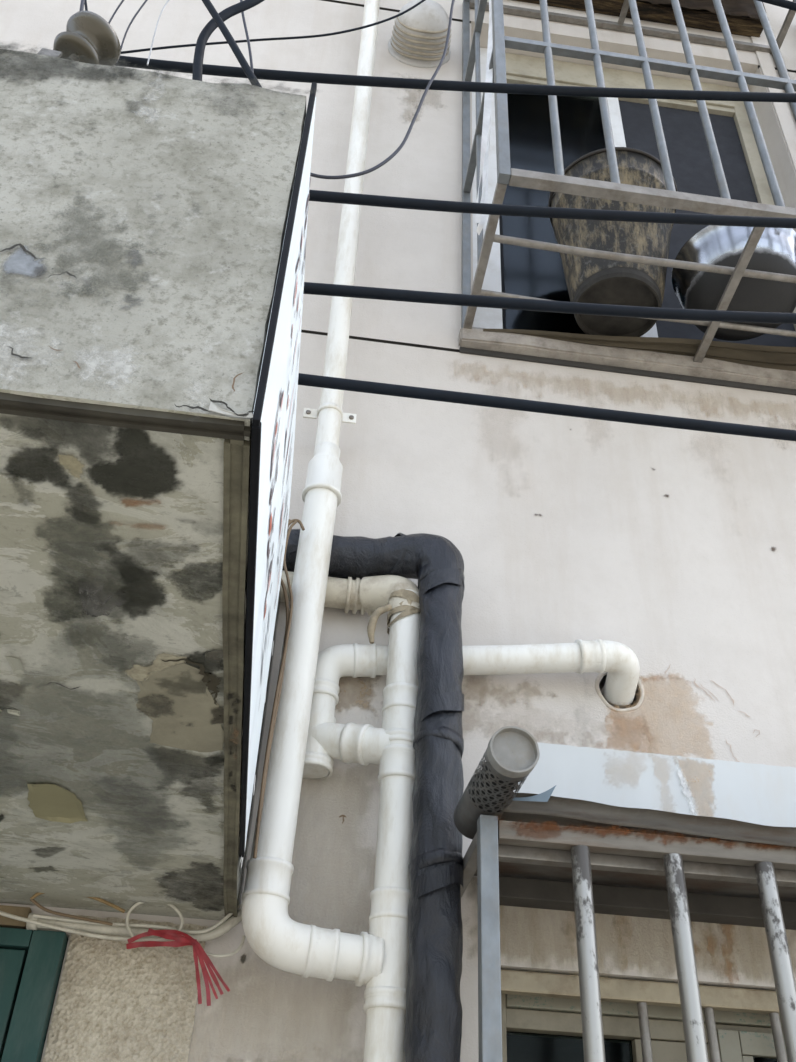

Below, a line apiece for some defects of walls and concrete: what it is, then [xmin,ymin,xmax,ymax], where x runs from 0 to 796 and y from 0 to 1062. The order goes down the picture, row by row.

spalling [0,243,77,279]
damp [0,416,223,623]
damp [183,652,224,675]
peeling [126,650,241,755]
damp [144,748,224,812]
peeling [27,784,88,823]
rust [515,822,796,849]
damp [35,847,63,872]
damp [159,863,224,911]